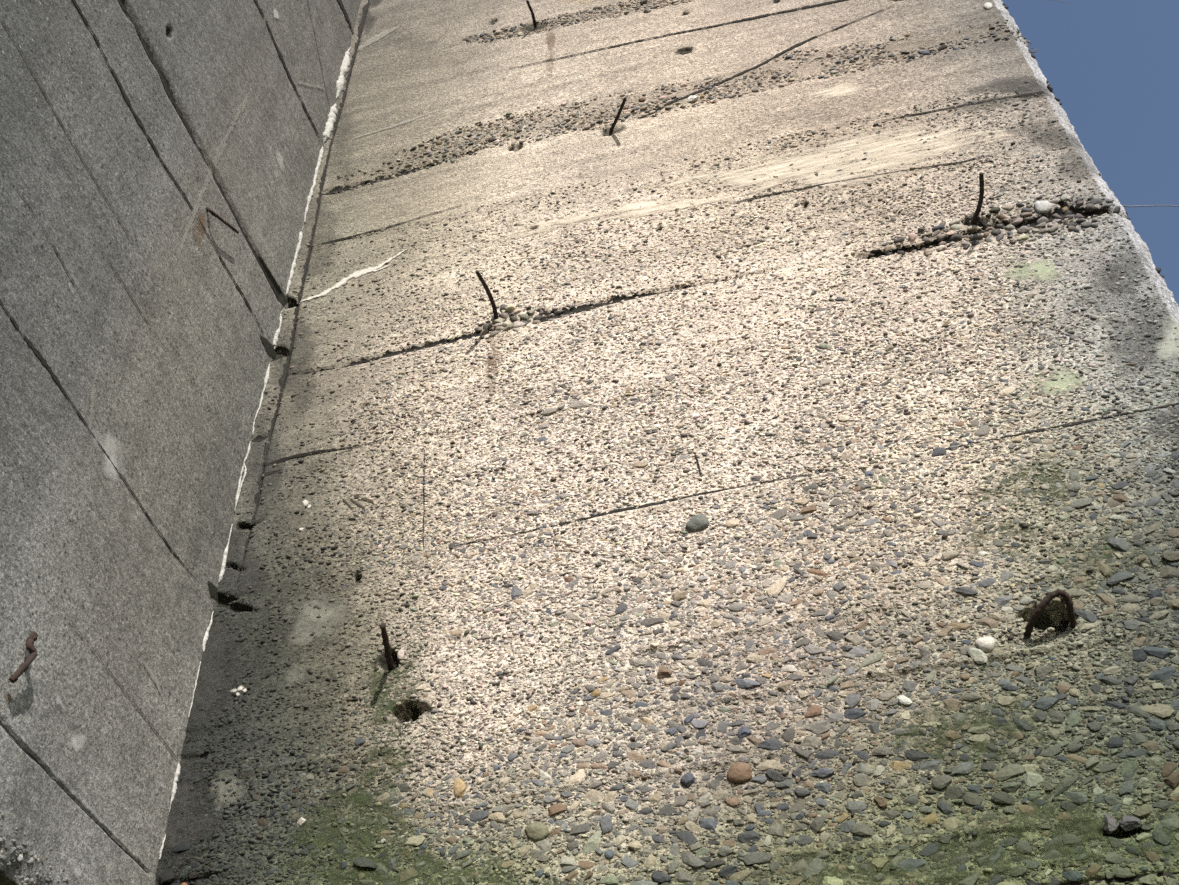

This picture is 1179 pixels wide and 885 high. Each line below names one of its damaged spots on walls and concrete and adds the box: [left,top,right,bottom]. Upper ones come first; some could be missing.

crack [498,0,901,118]
leakage [286,0,396,296]
leakage [273,311,287,353]
crack [536,280,726,322]
leakage [1148,324,1179,358]
leakage [235,364,278,509]
spalling [158,79,1179,885]
leakage [218,524,258,587]
leakage [188,611,225,718]
spalling [0,810,69,885]
leakage [159,762,212,860]
crack [1023,872,1179,885]